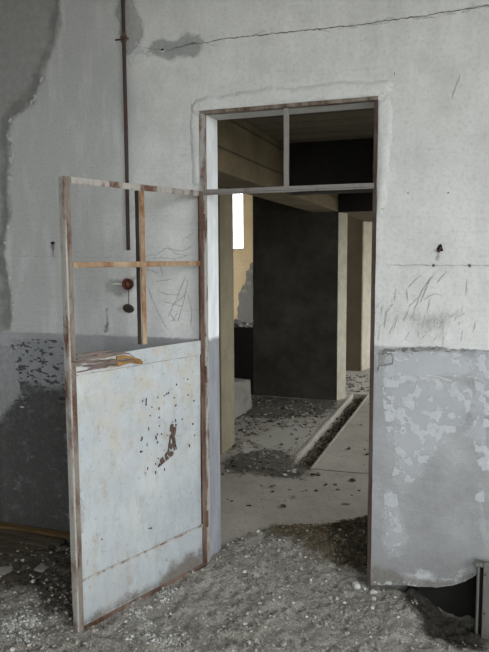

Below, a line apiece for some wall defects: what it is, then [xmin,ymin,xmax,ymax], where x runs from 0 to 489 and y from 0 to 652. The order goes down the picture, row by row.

crack [147,4,489,51]
flaking render [0,0,58,331]
flaking render [237,262,253,327]
peeling [0,339,65,415]
peeling [378,346,489,482]
spalling [373,568,477,586]